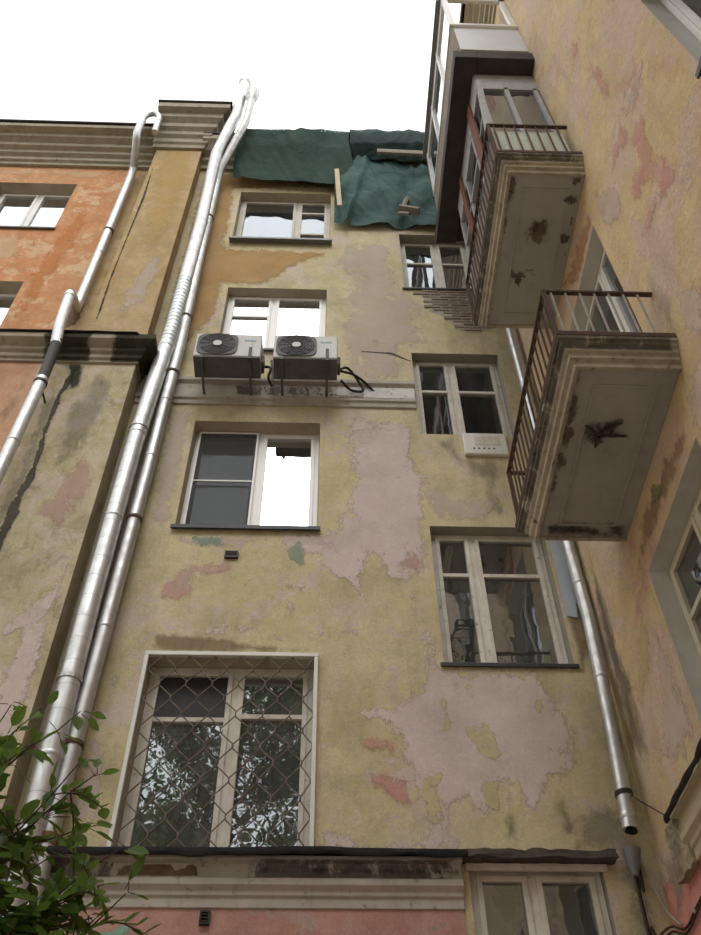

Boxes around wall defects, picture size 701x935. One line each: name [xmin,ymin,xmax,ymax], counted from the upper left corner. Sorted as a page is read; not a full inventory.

peeling [273,245,492,399]
peeling [280,419,428,598]
damp [157,636,211,649]
peeling [359,625,578,849]
spalling [111,864,197,876]
peeling [321,828,366,848]